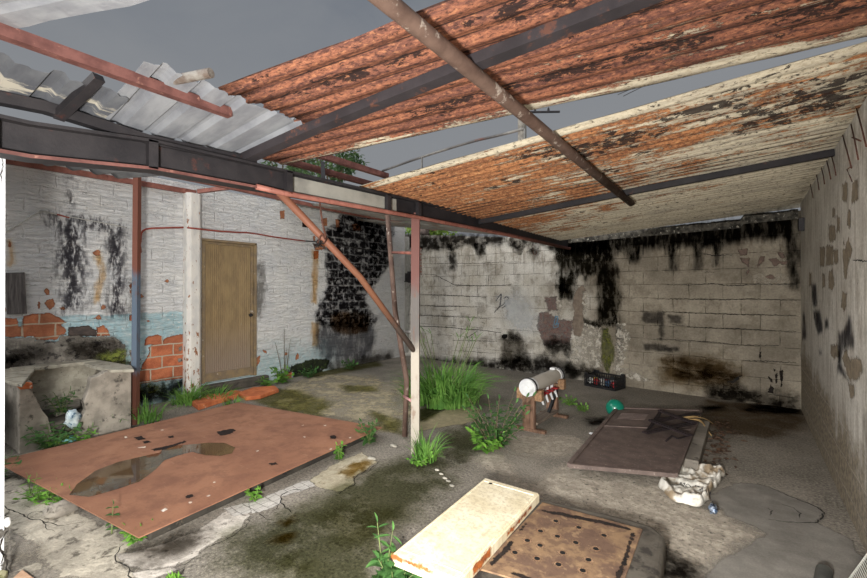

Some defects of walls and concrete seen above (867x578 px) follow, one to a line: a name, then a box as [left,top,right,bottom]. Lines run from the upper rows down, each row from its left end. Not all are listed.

leakage [52,216,124,316]
leakage [348,216,394,283]
leakage [405,210,801,346]
spalling [5,288,183,384]
peeling [536,286,648,381]
leakage [802,311,828,341]
leakage [666,357,800,414]
spalling [830,343,862,398]
crack [0,505,80,570]
crack [114,545,150,578]